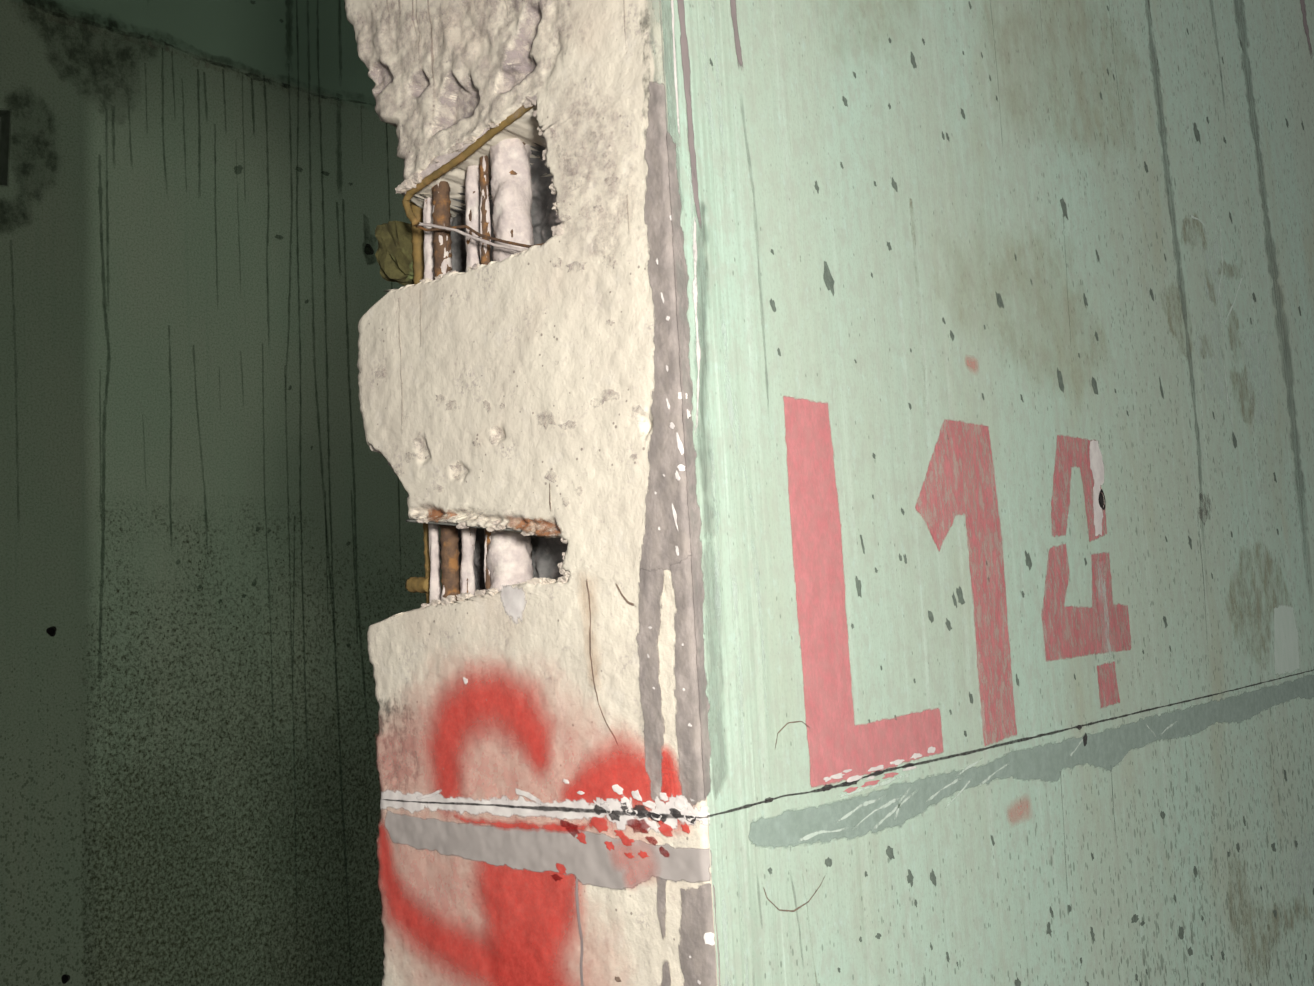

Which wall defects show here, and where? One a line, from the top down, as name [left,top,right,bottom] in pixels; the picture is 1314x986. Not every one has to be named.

spalling [395,72,480,194]
spalling [504,6,565,256]
damp [288,104,353,461]
spalling [419,178,495,282]
spalling [416,509,570,608]
crack [384,669,1314,824]